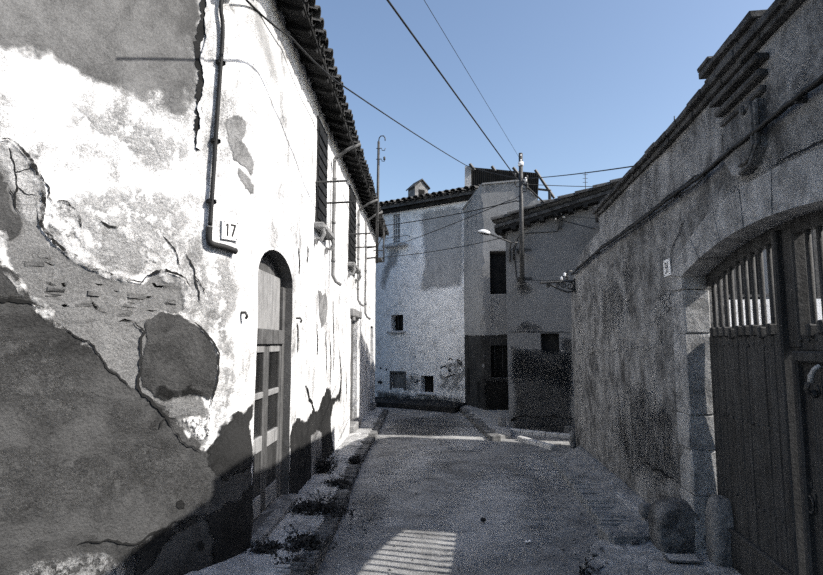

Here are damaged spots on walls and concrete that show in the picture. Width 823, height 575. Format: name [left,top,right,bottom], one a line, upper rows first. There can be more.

flaking render [72,106,187,167]
crack [193,0,211,151]
flaking render [225,115,254,193]
crack [0,137,220,405]
flaking render [0,139,252,575]
flaking render [311,430,322,477]